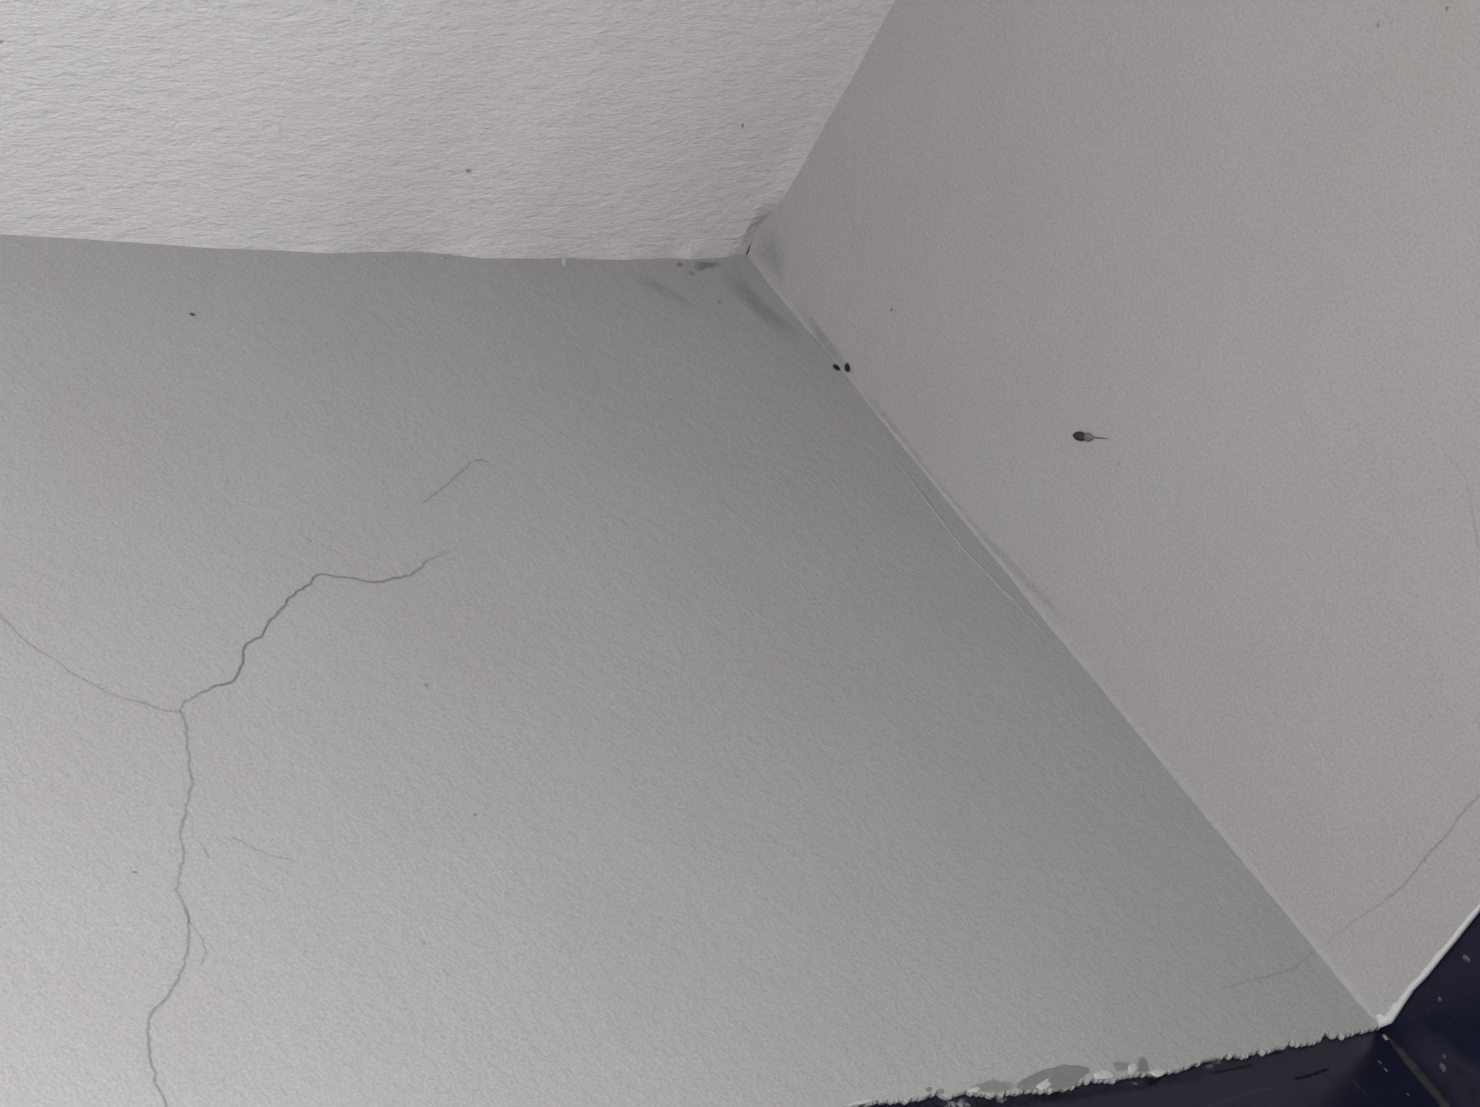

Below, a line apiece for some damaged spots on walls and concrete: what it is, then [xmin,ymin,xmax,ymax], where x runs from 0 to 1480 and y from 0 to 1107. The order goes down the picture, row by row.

peeling [1017,1058,1168,1090]